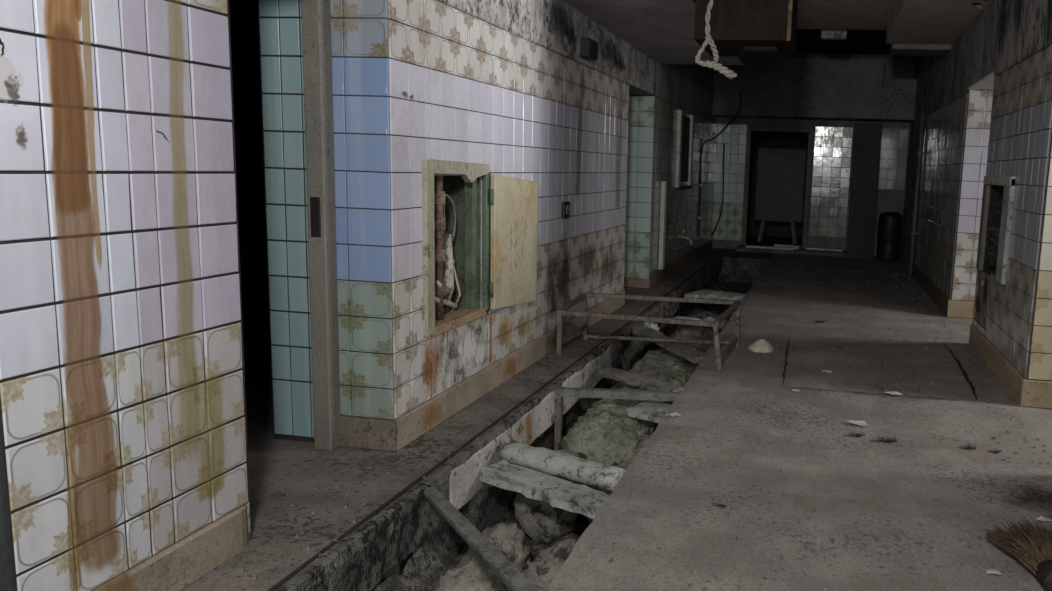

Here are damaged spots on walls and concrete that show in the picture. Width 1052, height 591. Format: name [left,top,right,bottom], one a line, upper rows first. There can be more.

crack [782,338,978,401]